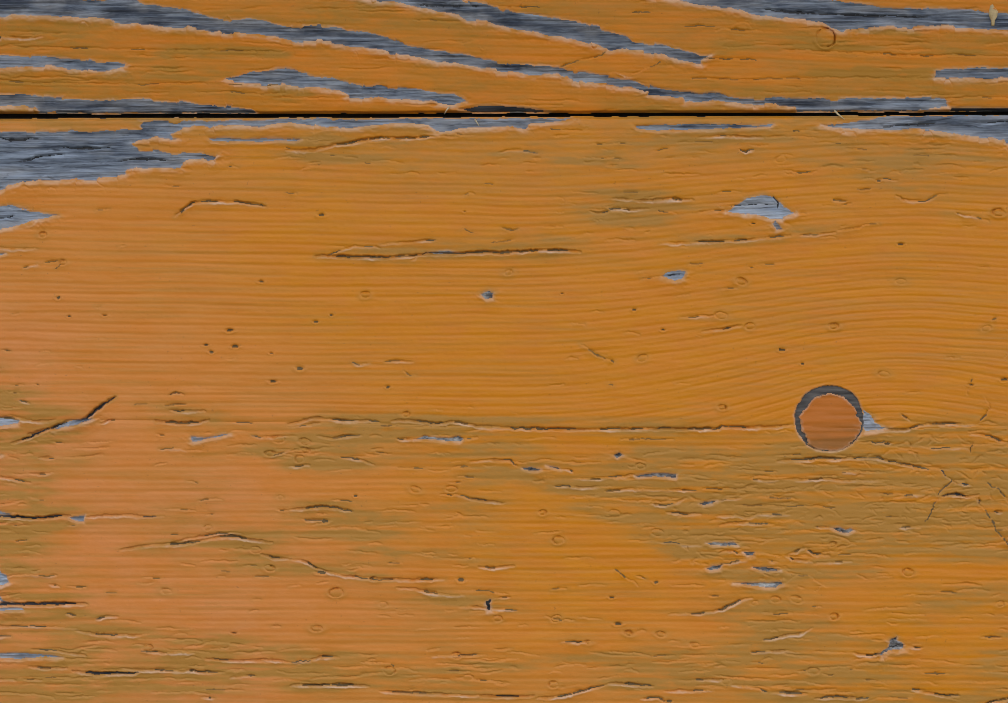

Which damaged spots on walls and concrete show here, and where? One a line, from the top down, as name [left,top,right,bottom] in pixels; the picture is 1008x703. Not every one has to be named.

peeling [0,0,1008,143]
peeling [0,94,570,190]
peeling [0,205,52,230]
crack [330,228,568,258]
peeling [728,195,793,230]
crack [4,385,139,482]
crack [600,425,746,440]
crack [659,415,1003,530]
crack [0,500,75,542]
crack [143,482,247,545]
crack [0,575,118,680]
crack [86,651,228,699]